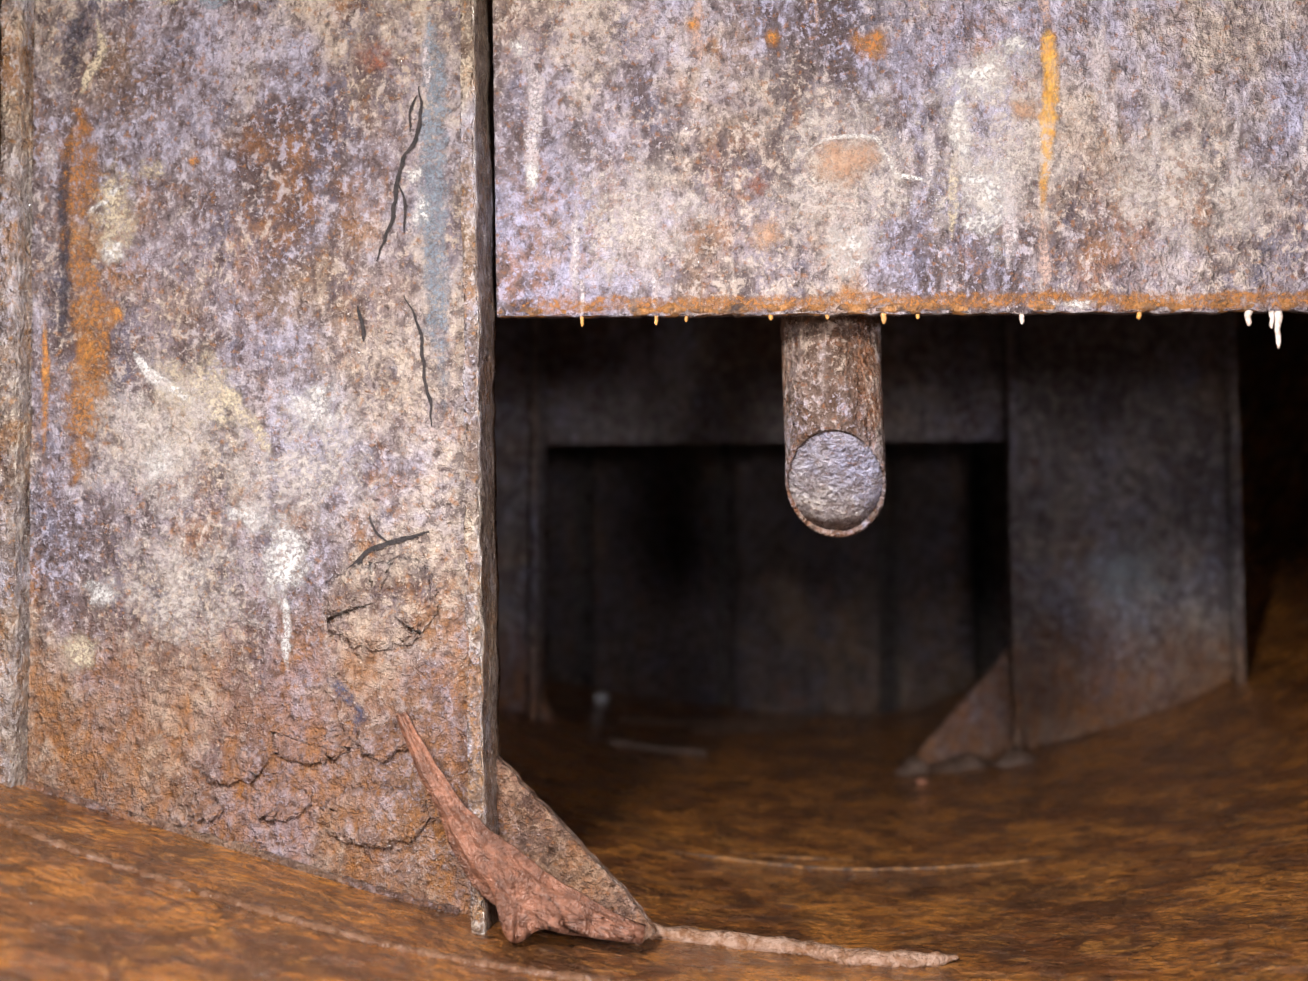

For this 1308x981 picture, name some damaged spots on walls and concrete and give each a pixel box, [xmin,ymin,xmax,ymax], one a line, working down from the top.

corrosion [1038,0,1059,194]
crack [376,85,423,261]
corrosion [41,324,50,450]
corrosion [61,108,122,486]
crack [357,306,366,341]
crack [403,295,432,426]
crack [347,515,429,569]